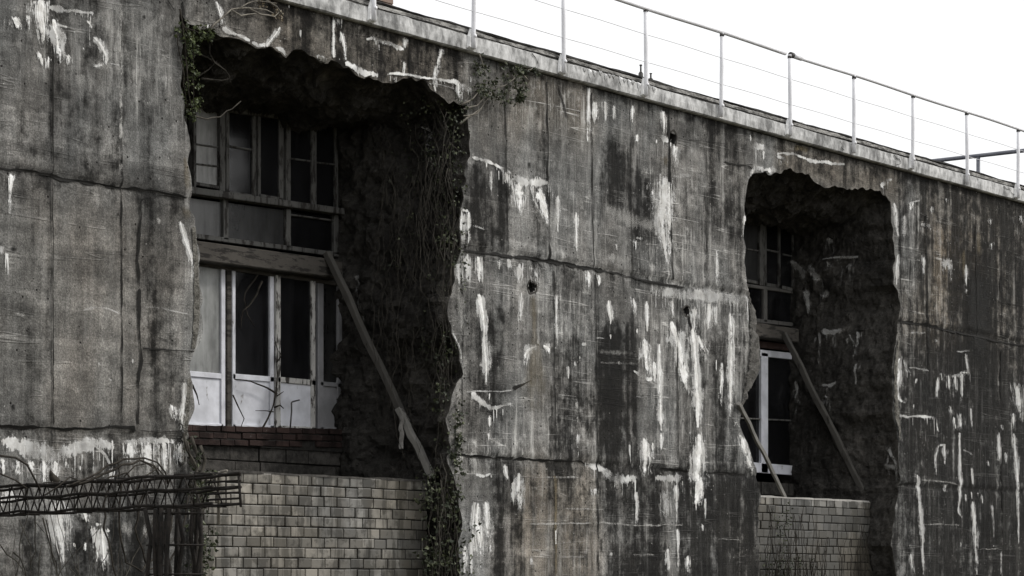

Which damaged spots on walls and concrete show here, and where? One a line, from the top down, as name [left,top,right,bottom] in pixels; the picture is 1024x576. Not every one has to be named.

efflorescence [12,0,70,68]
efflorescence [472,157,559,230]
efflorescence [51,501,109,570]
crack [0,167,194,433]
spalling [161,378,192,458]
spalling [186,227,200,349]
efflorescence [456,209,498,459]
efflorescence [463,502,491,573]
crack [457,454,626,573]
efflorescence [629,298,663,474]
crack [660,467,745,475]
efflorescence [662,289,753,527]